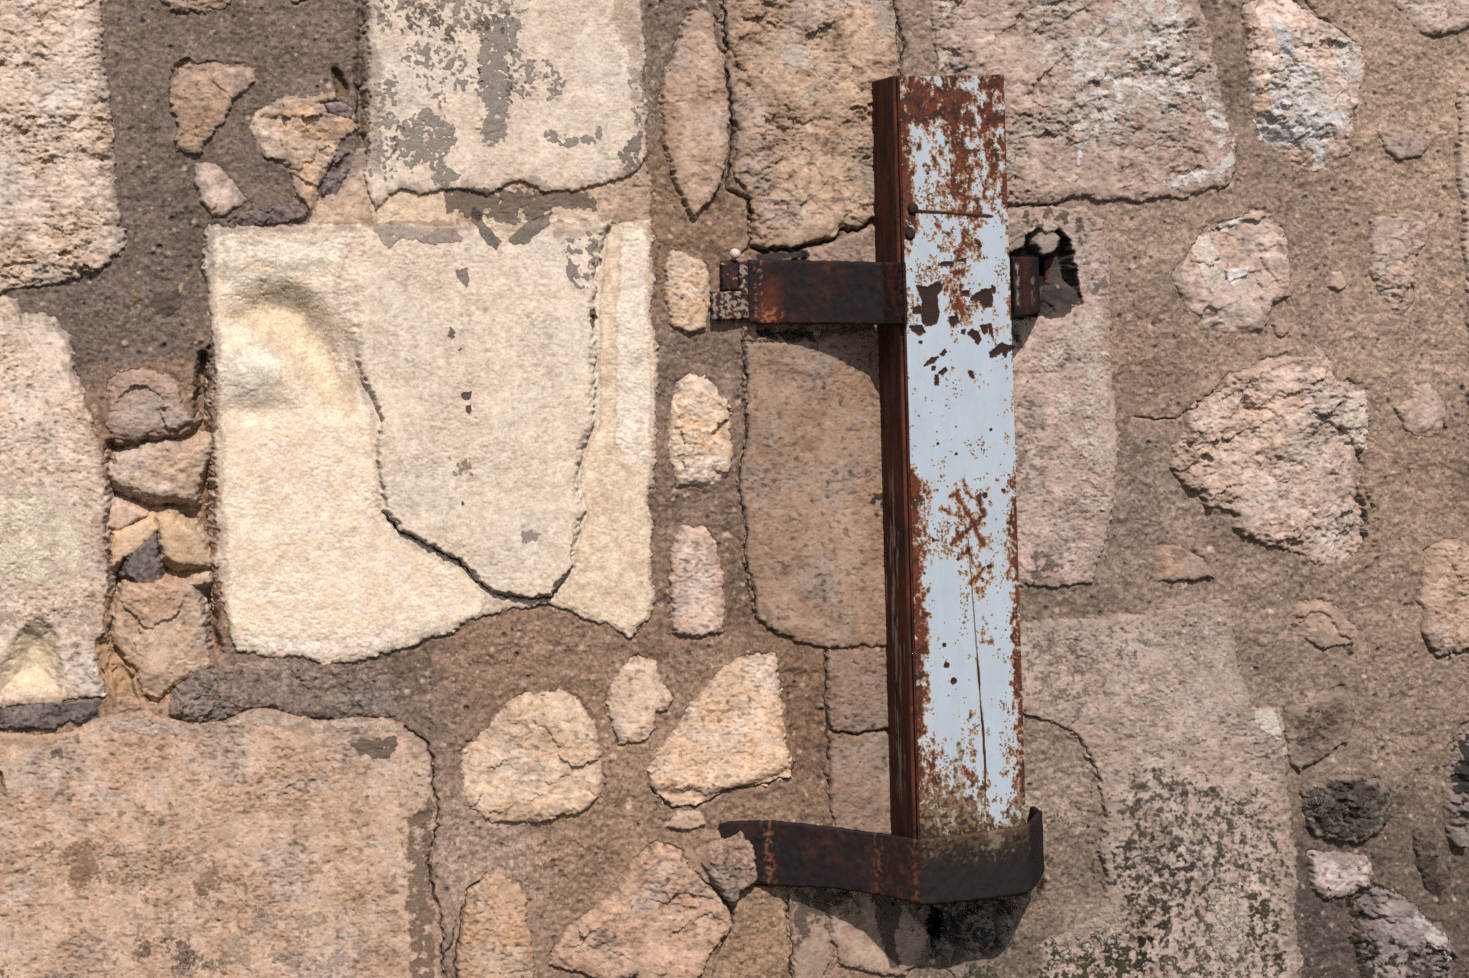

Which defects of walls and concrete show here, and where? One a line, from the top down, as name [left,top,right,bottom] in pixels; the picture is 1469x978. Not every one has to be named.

rust [740,327,817,342]
rust [899,75,1026,839]
peeling [1008,225,1121,582]
crack [405,727,485,978]
leakage [1305,902,1353,978]